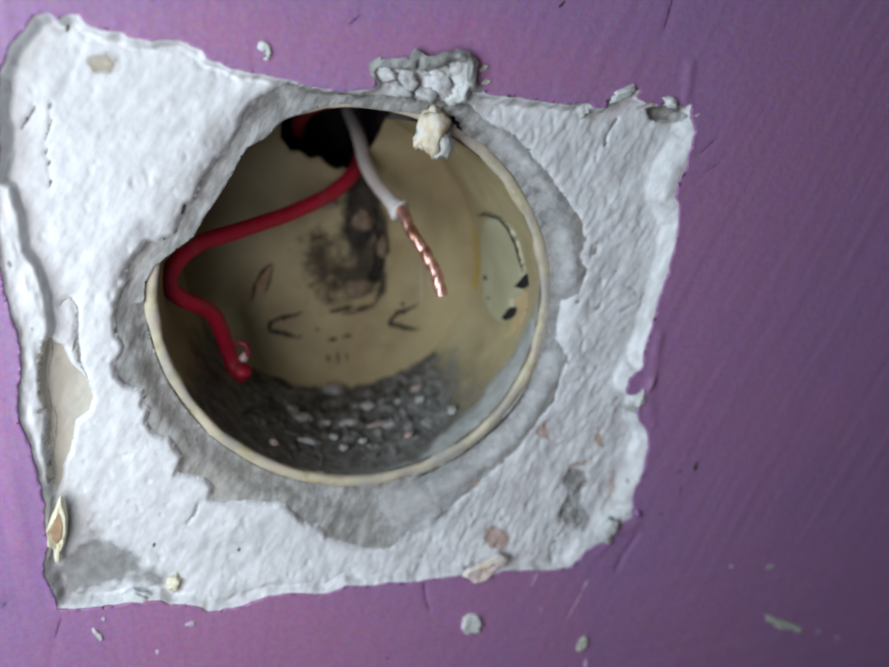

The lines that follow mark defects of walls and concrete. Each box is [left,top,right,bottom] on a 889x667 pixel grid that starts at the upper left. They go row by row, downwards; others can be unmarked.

spalling [0,14,701,641]